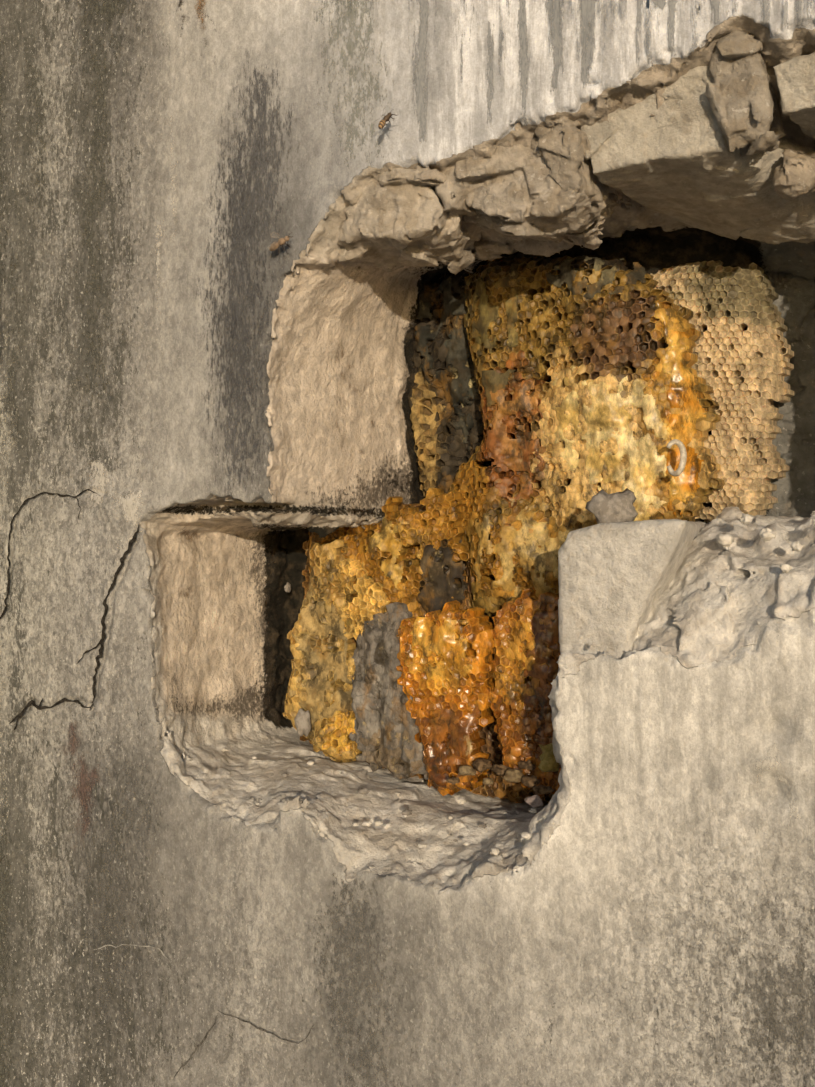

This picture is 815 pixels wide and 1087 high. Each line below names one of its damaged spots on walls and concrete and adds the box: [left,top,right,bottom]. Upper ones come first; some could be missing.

water stain [409,0,428,142]
water stain [487,21,504,123]
water stain [499,0,530,126]
water stain [545,0,676,92]
water stain [691,0,738,52]
water stain [205,68,292,497]
spalling [88,14,815,894]
crack [0,489,100,619]
crack [9,523,140,730]
crack [173,1011,313,1079]